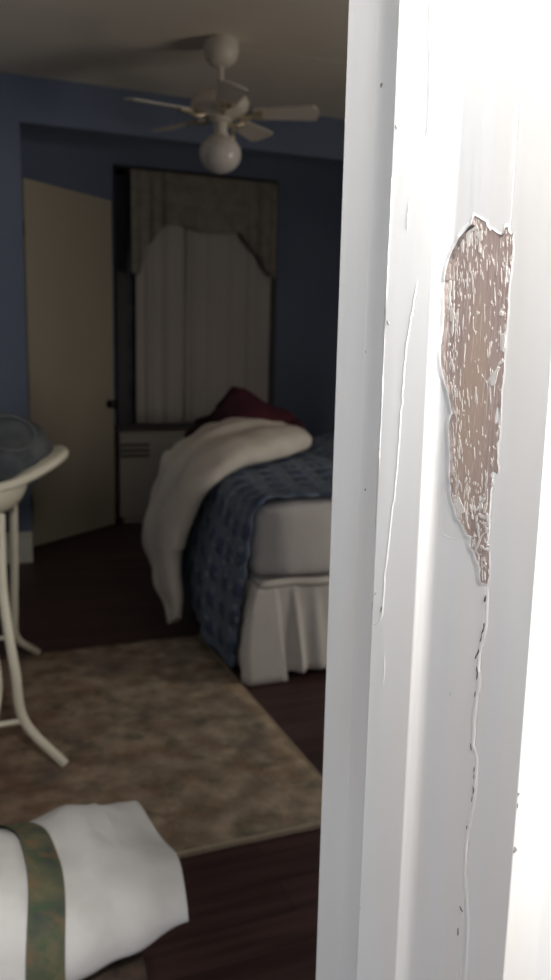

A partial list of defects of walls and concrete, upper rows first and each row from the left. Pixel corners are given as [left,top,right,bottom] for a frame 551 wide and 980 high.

peeling [435,213,516,586]
crack [457,586,489,980]